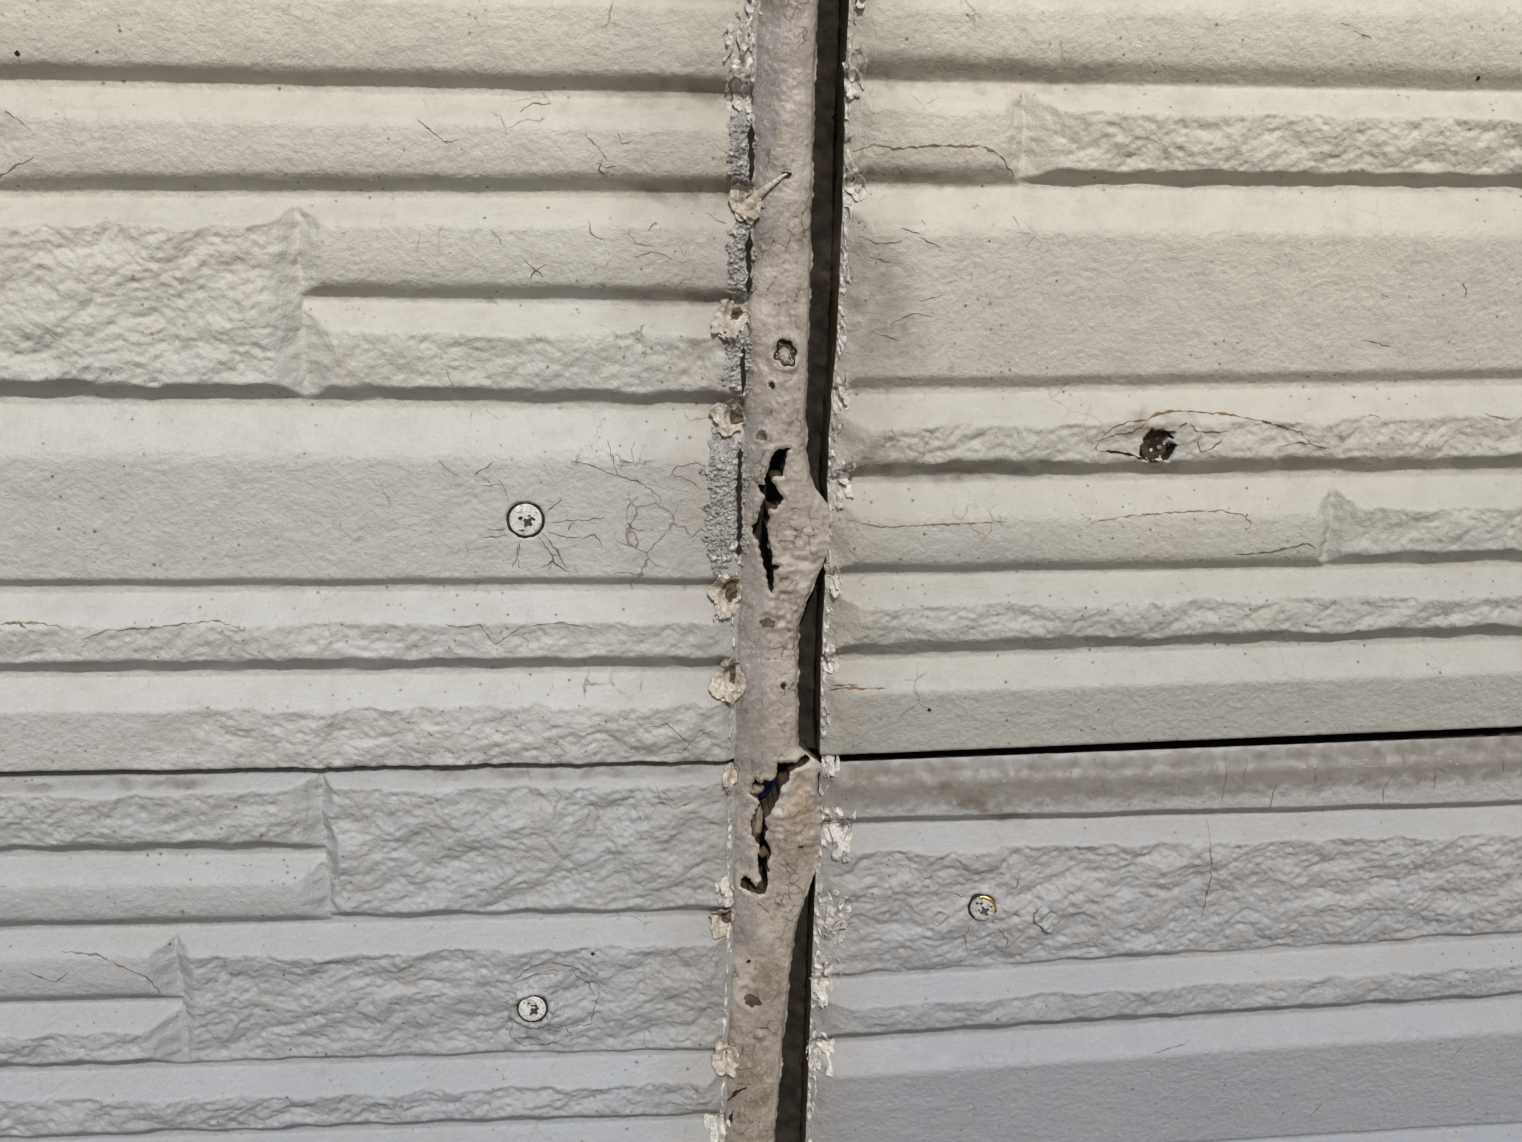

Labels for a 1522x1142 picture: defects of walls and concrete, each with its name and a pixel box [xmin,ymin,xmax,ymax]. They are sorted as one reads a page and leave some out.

spalling [699,0,792,1142]
crack [1378,752,1447,806]
crack [750,858,793,921]